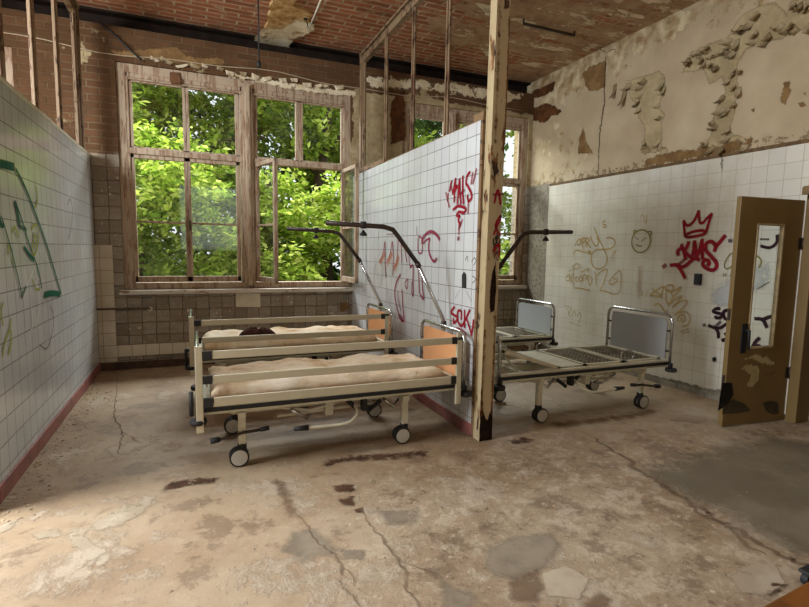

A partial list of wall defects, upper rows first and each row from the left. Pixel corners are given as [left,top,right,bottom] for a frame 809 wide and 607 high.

peeling [254,20,315,48]
peeling [366,76,487,145]
spalling [494,16,561,145]
spalling [578,129,592,154]
peeling [583,0,809,166]
crack [113,376,140,454]
peeling [741,354,778,388]
crack [596,439,809,565]
crack [297,515,361,607]
crack [360,509,438,607]